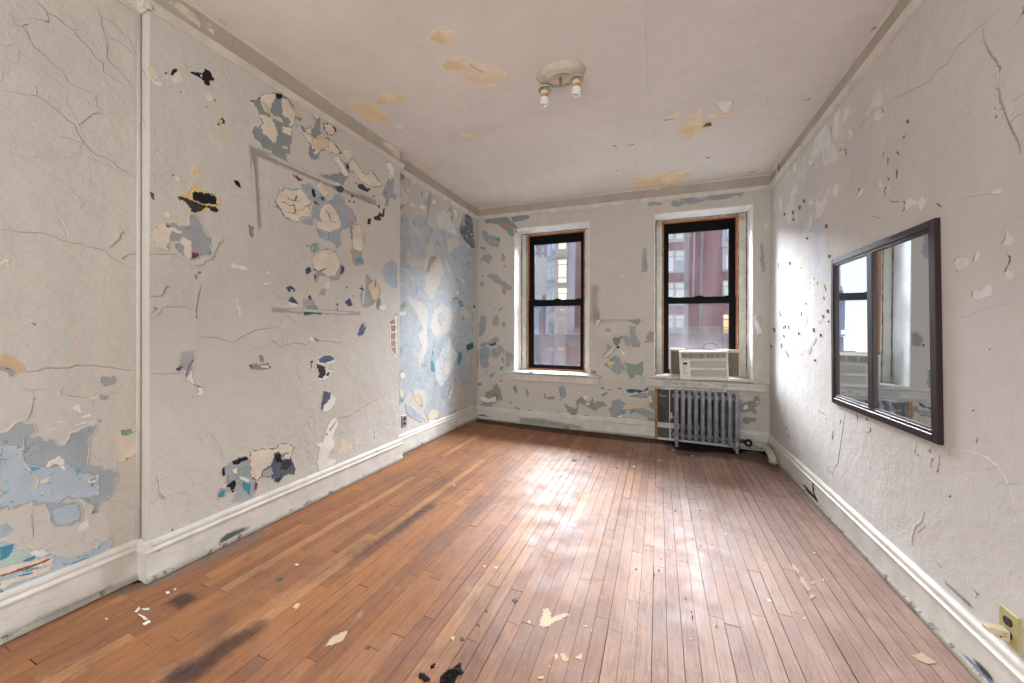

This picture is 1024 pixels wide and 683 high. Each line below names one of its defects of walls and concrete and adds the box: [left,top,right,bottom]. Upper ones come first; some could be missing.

crack [1,0,147,180]
peeling [147,65,217,108]
crack [982,24,1024,154]
peeling [149,164,222,281]
peeling [248,91,532,423]
peeling [628,165,744,208]
peeling [758,104,854,361]
crack [22,360,136,422]
flaking render [310,353,339,471]
peeling [543,320,738,422]
peeling [0,420,136,593]
peeling [216,442,297,504]